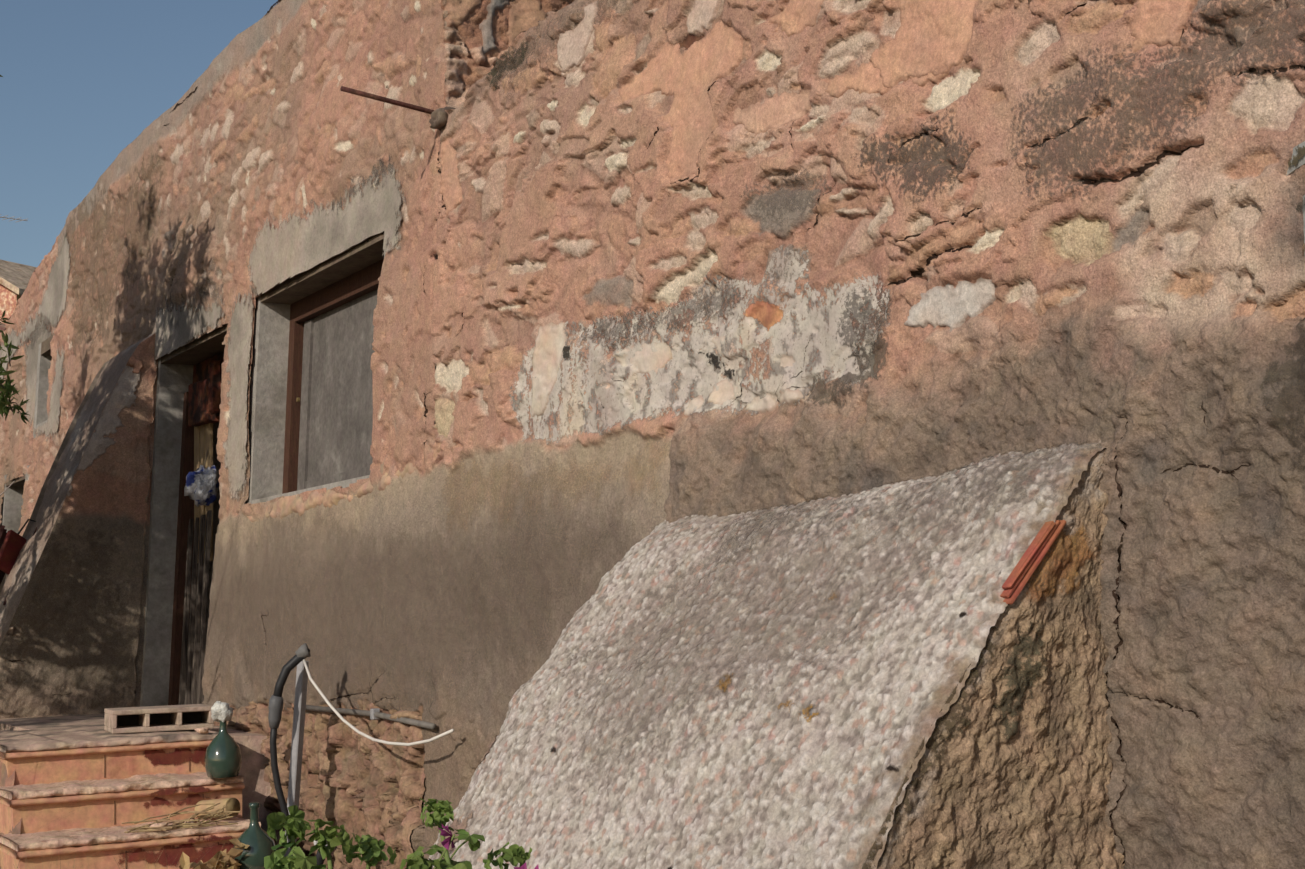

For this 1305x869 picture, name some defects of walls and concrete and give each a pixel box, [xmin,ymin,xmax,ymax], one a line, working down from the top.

crack [1028,116,1090,148]
crack [1079,144,1204,185]
peeling [509,245,996,445]
crack [1163,463,1250,480]
rust [1027,526,1093,600]
crack [1105,415,1201,864]